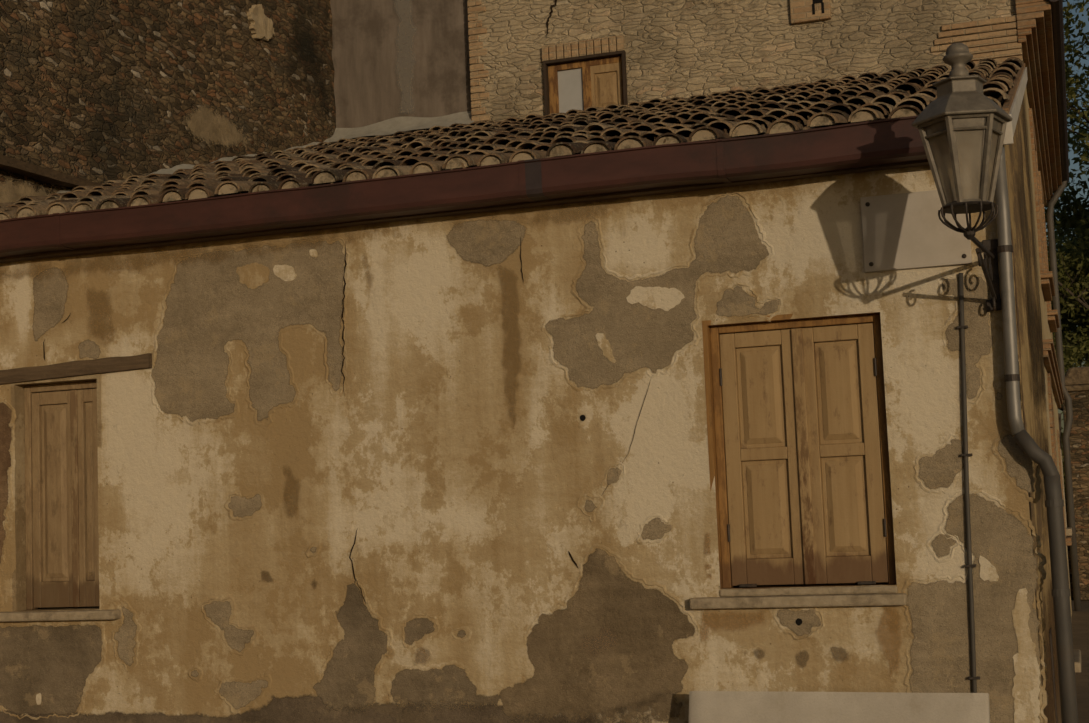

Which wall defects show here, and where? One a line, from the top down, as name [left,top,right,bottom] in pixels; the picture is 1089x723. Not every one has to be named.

crack [546,0,557,38]
peeling [149,237,350,427]
peeling [447,220,526,266]
peeling [541,190,783,395]
peeling [936,271,1006,406]
spalling [1005,155,1026,430]
leakage [1027,294,1046,407]
spalling [0,384,17,574]
spalling [0,620,107,720]
peeling [313,544,700,723]
peeling [902,427,1048,723]